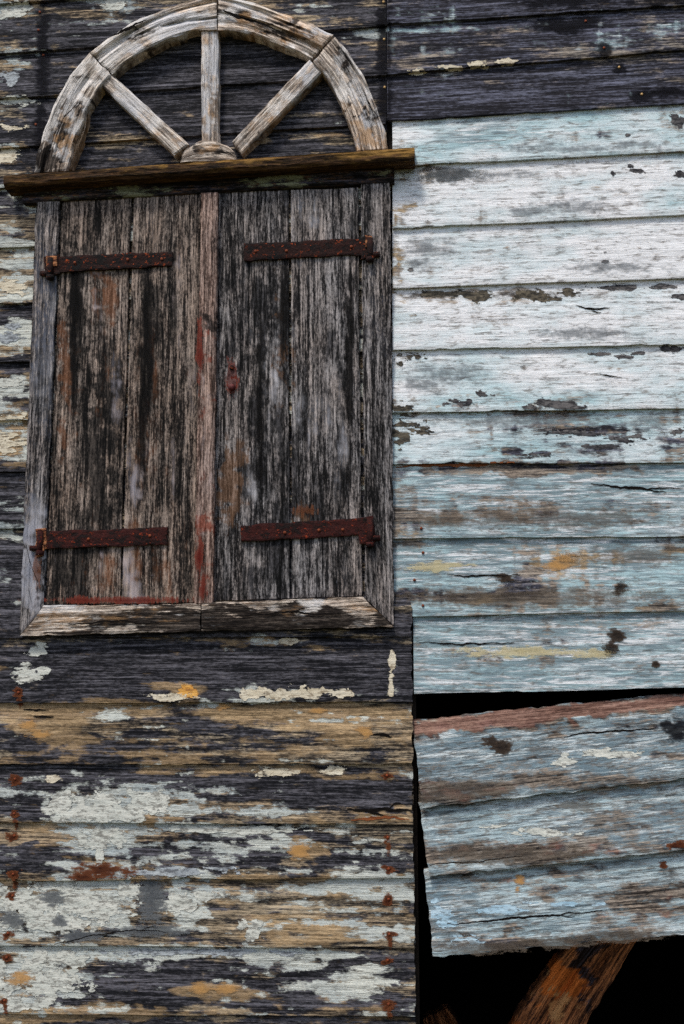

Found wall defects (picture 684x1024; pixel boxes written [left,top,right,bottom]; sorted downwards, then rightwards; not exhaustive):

peeling [407,57,518,76]
peeling [420,289,493,304]
peeling [507,283,684,303]
peeling [537,427,651,450]
corrosion [32,534,208,604]
peeling [147,684,200,702]
peeling [239,684,354,701]
peeling [251,765,301,779]
peeling [41,775,338,875]
corrosion [64,860,136,881]
crack [447,910,602,925]
peeling [0,866,316,1017]